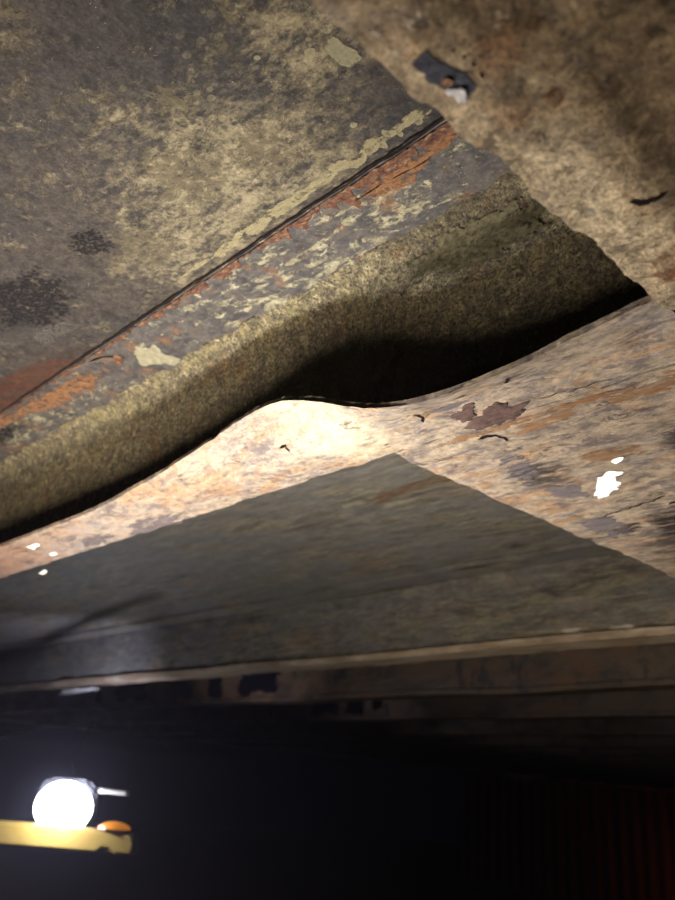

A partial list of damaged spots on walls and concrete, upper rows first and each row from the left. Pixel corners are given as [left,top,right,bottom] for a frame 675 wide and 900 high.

spalling [411,49,483,104]
corrosion [359,131,458,202]
corrosion [402,198,550,282]
peeling [134,345,181,366]
corrosion [0,354,123,427]
peeling [544,482,592,502]
peeling [129,514,183,536]
peeling [575,511,675,537]
peeling [80,534,113,547]